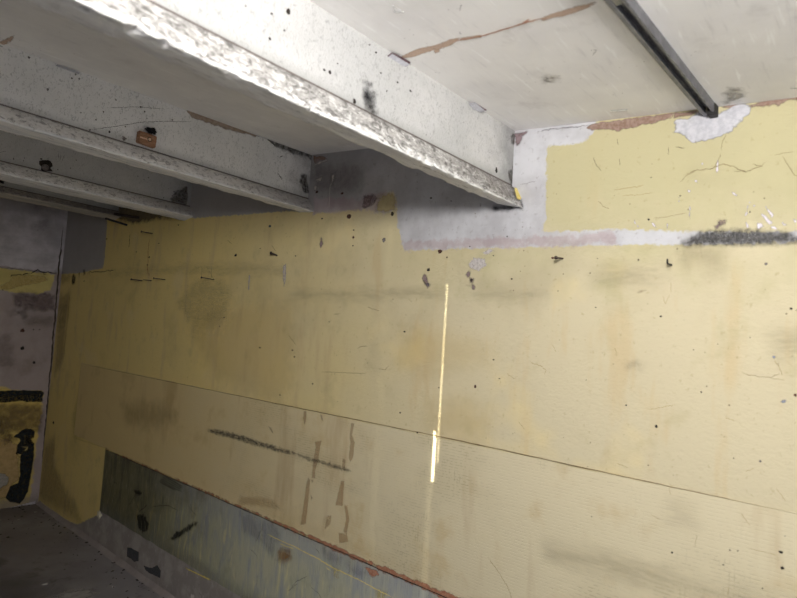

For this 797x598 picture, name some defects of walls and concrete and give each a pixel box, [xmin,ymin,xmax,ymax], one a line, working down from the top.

crack [683,135,796,179]
peeling [745,202,797,229]
corrosion [123,455,458,598]